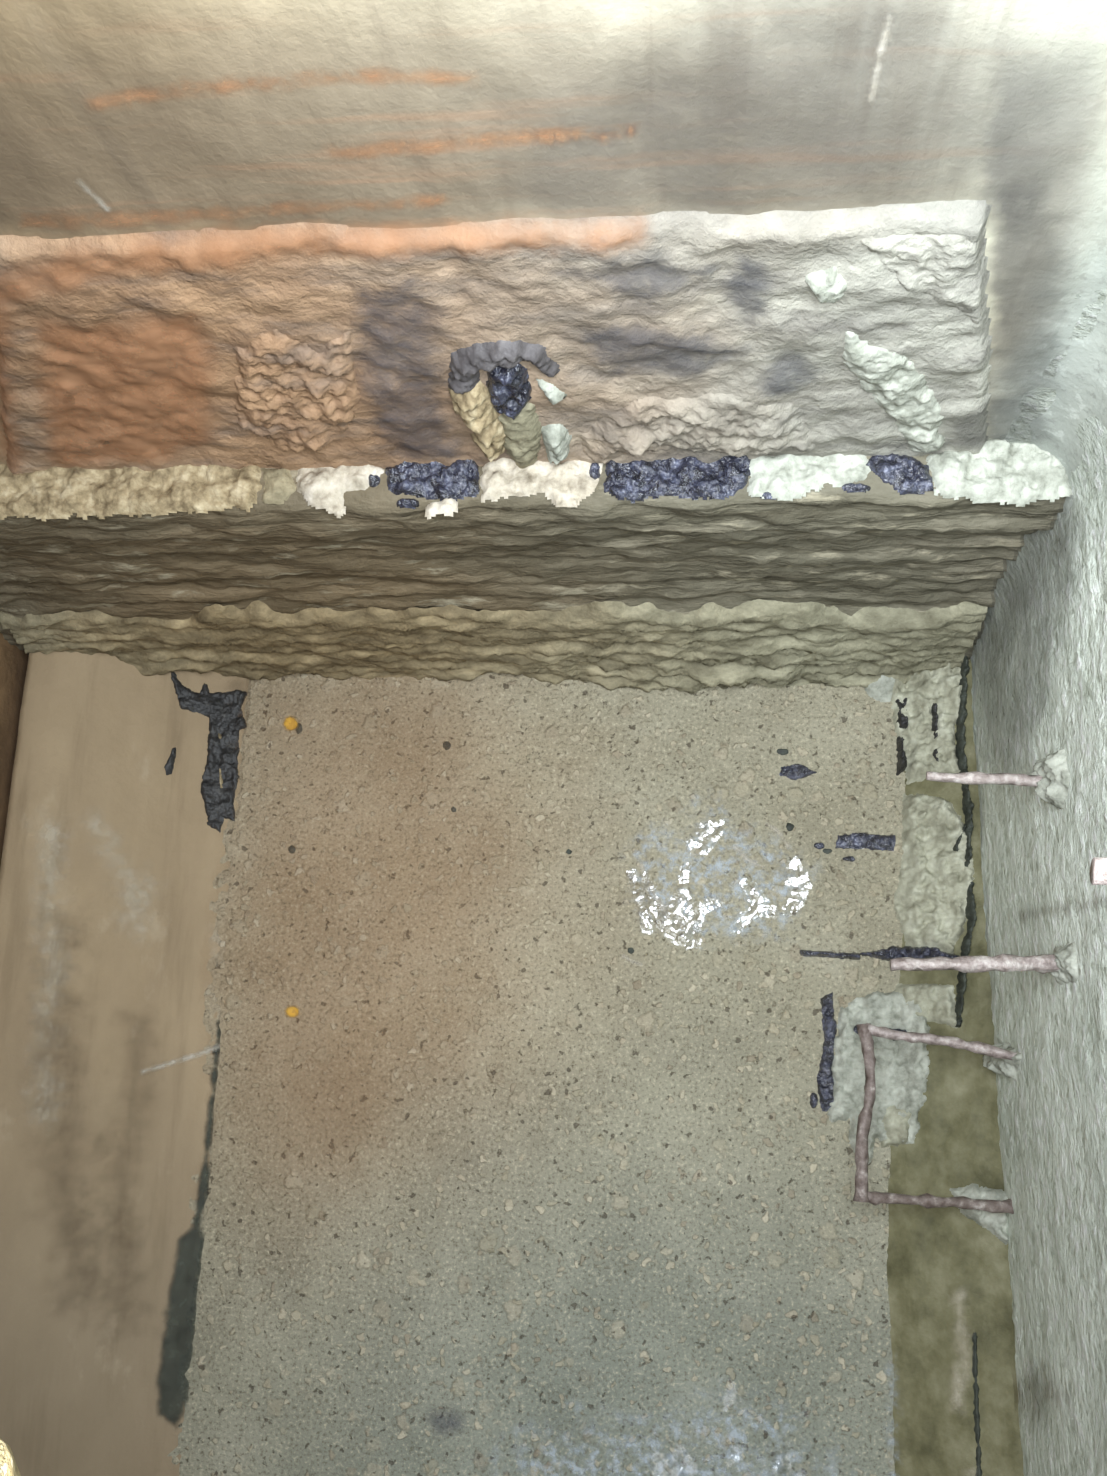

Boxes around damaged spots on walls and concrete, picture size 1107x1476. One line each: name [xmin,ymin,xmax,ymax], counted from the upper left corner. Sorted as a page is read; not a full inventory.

spalling [448,340,572,469]
peeling [368,474,380,487]
peeling [397,498,419,509]
peeling [589,463,600,480]
peeling [814,842,855,862]
peeling [891,663,975,954]
peeling [810,983,958,1164]
crack [158,1020,221,1424]